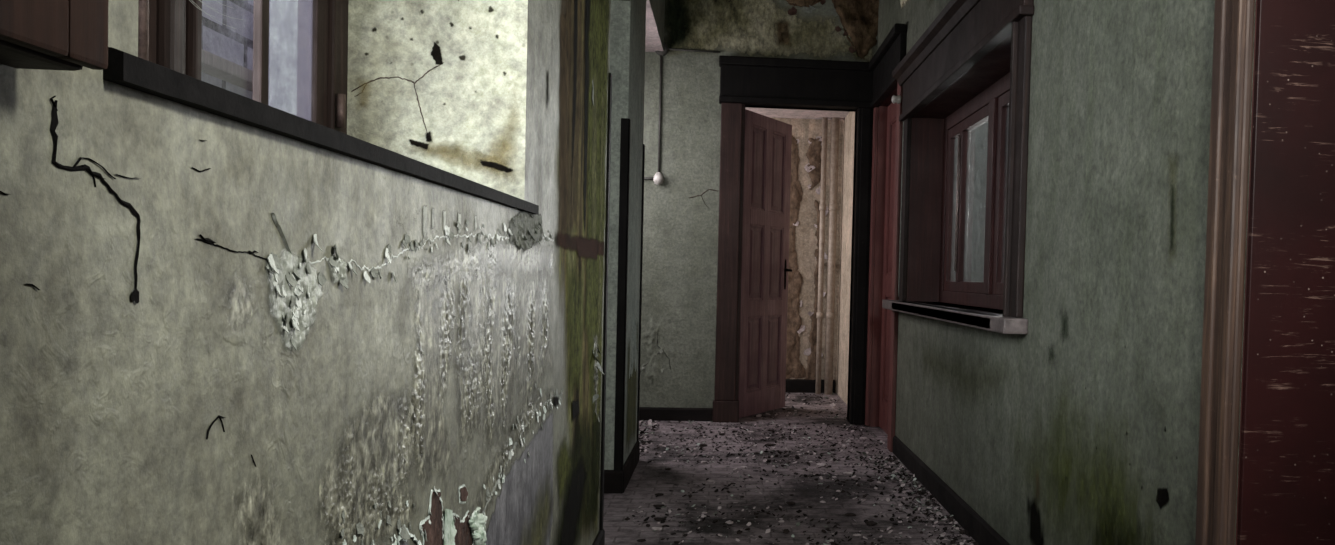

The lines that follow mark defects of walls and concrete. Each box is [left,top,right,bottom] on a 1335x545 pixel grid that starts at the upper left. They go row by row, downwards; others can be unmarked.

flaking render [786,0,879,59]
crack [351,62,444,131]
crack [50,96,141,303]
crack [196,234,268,260]
peeling [271,211,555,289]
water stain [546,0,607,545]
peeling [786,136,829,380]
peeling [341,383,563,545]
water stain [1027,477,1043,545]
water stain [1141,486,1169,509]